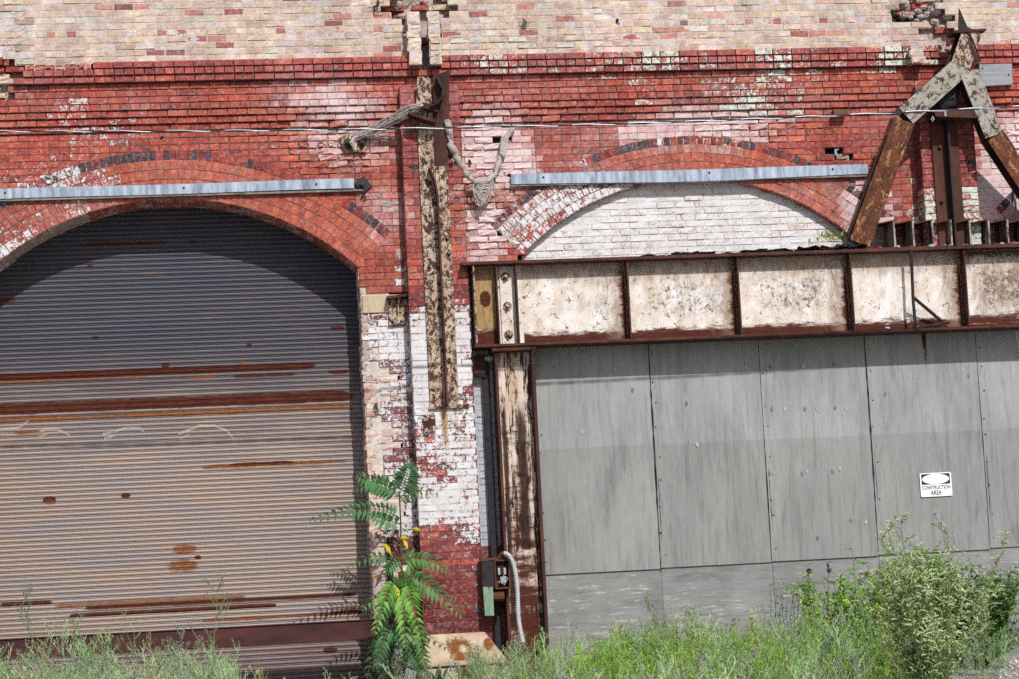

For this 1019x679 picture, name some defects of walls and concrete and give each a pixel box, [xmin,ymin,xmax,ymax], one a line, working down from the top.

spalling [381,0,458,38]
spalling [420,37,440,70]
peeling [540,48,847,117]
spalling [861,0,955,74]
peeling [1,98,143,188]
corrosion [521,249,1019,360]
corrosion [0,361,315,383]
corrosion [0,390,353,434]
peeling [361,277,501,577]
corrosion [204,460,343,469]
corrosion [501,408,544,679]
corrosion [0,593,363,622]